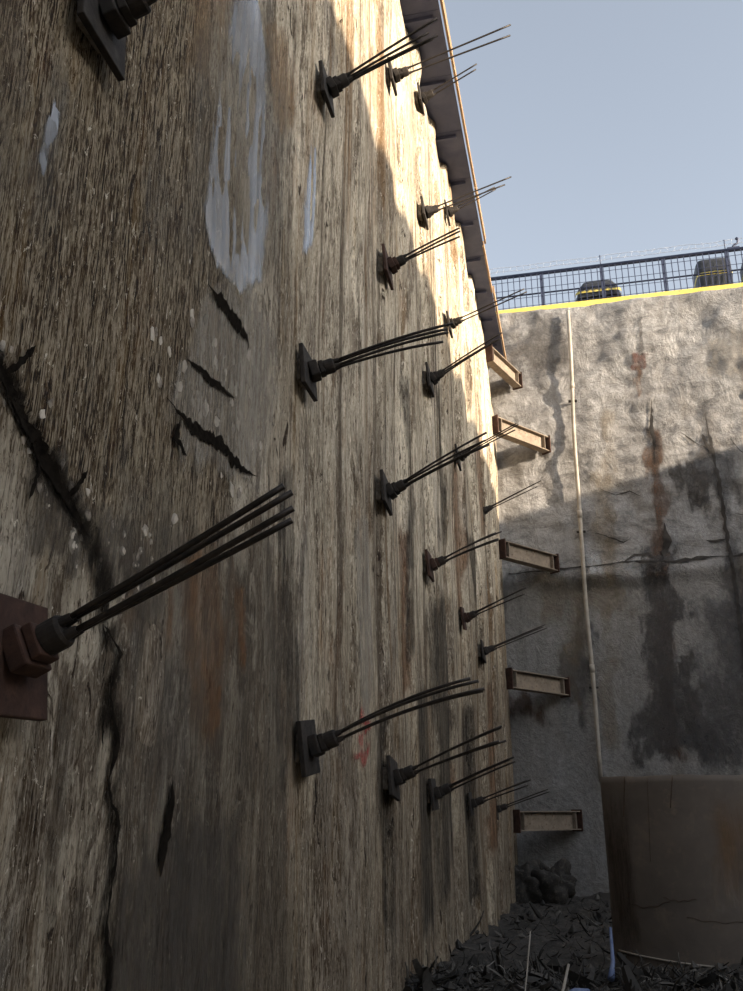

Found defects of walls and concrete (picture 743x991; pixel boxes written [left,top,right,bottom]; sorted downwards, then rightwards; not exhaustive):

corrosion [631,317,646,397]
crack [509,397,743,655]
corrosion [642,400,672,576]
damp [668,460,714,511]
crack [0,340,127,991]
damp [628,547,743,767]